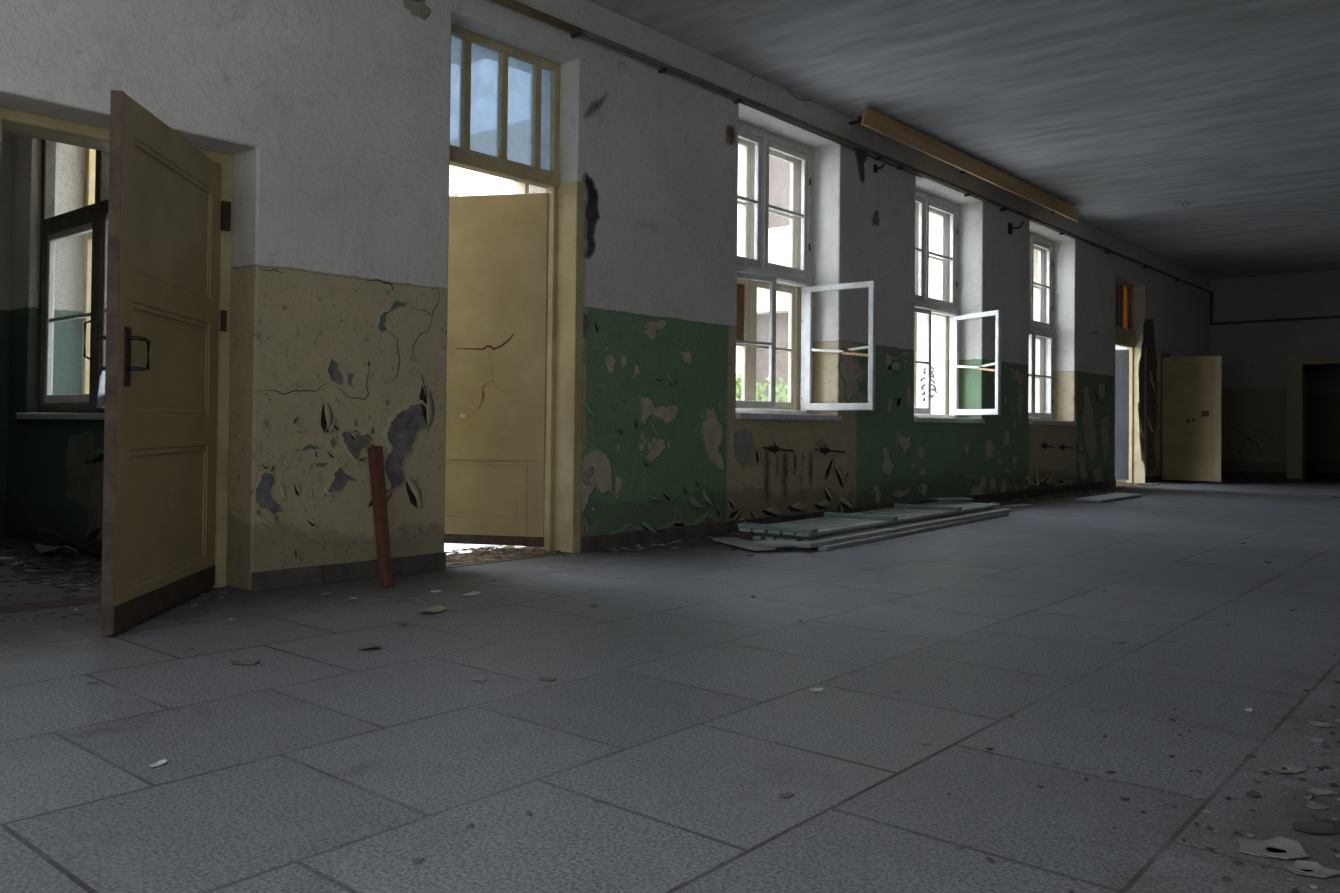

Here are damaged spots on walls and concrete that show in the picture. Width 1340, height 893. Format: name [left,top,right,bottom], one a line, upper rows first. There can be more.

peeling [403,0,431,20]
spalling [582,171,600,259]
peeling [65,431,104,540]
peeling [326,357,354,390]
peeling [253,385,435,527]
crack [254,279,439,430]
crack [456,333,521,409]
spalling [581,312,693,515]
peeling [695,403,733,474]
peeling [728,433,855,523]
peeling [838,339,868,403]
peeling [964,366,1024,495]